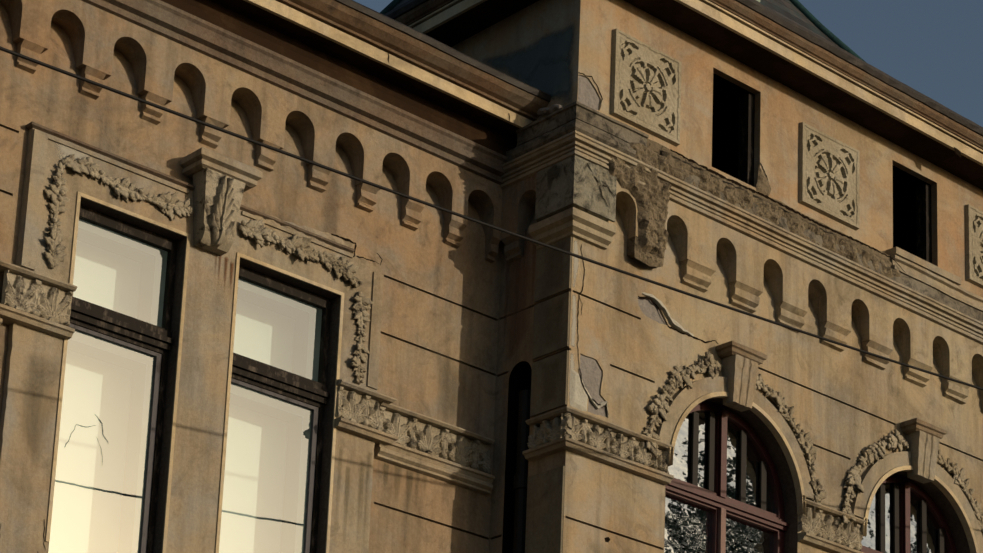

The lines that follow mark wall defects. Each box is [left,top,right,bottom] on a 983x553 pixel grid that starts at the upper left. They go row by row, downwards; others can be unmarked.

leakage [488,26,573,101]
spalling [578,72,603,110]
crack [577,244,585,373]
peeling [638,292,718,344]
spalling [570,296,609,417]